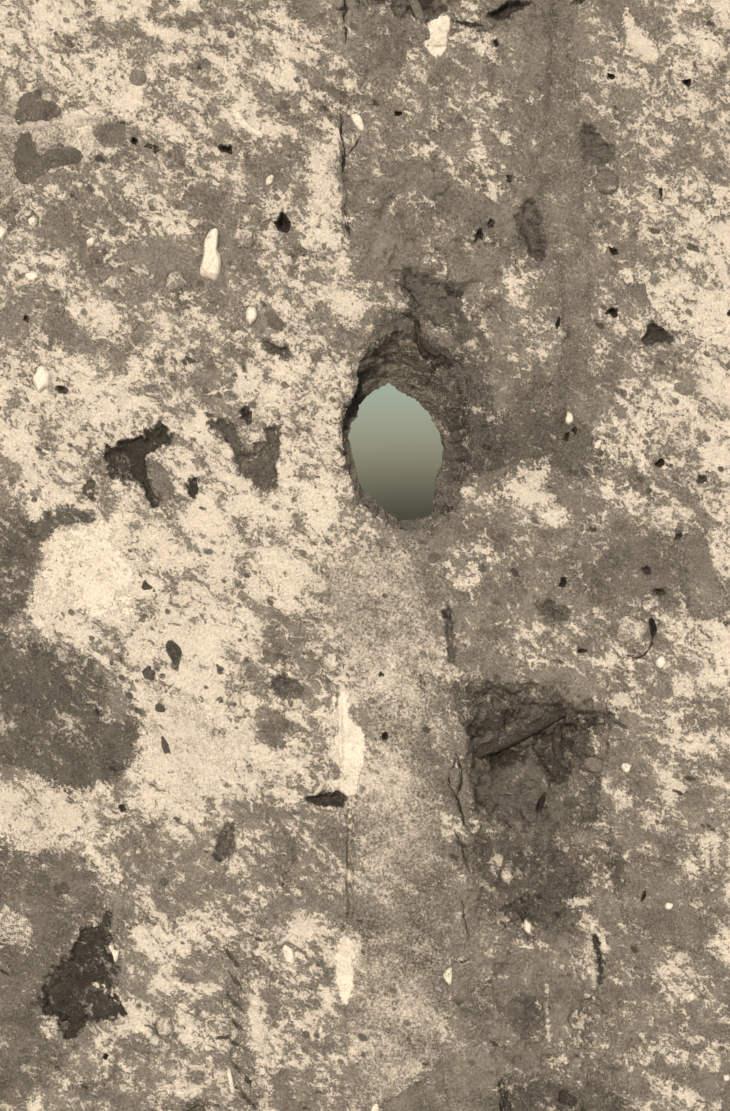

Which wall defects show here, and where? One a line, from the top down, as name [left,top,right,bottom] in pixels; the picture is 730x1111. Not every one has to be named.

crack [336,0,360,44]
crack [339,117,360,178]
crack [343,211,351,236]
spalling [325,258,478,537]
spalling [82,420,174,508]
spalling [184,477,200,498]
spalling [206,405,283,494]
spalling [37,910,128,1040]